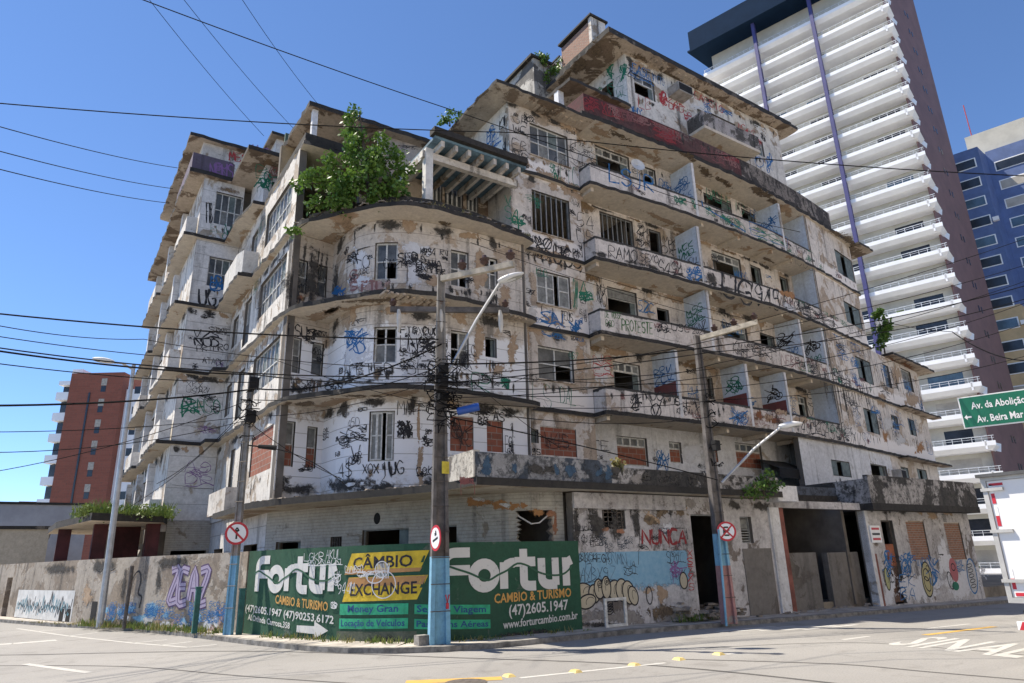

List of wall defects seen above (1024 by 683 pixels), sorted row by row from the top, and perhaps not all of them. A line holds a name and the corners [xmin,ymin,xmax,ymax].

leakage [626,56,672,84]
spalling [556,36,788,137]
leakage [530,111,607,156]
spalling [577,125,657,165]
leakage [512,448,576,478]
flaking render [467,497,558,542]
leakage [45,563,74,574]
leakage [93,559,127,597]
leakage [156,556,187,594]